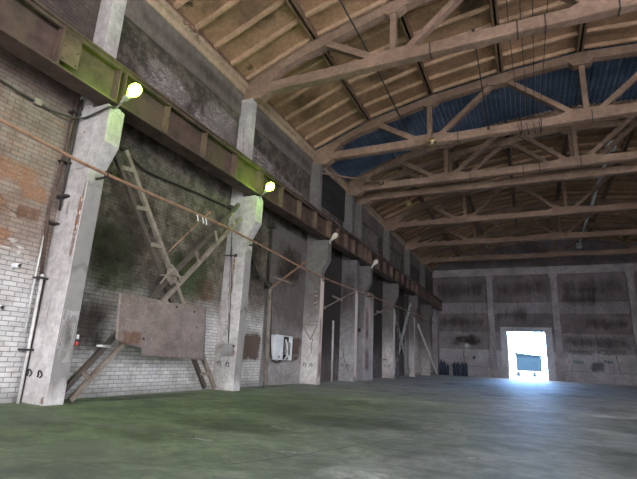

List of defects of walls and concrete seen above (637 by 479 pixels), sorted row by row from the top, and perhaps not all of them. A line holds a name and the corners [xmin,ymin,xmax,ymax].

damp [50,182,102,386]